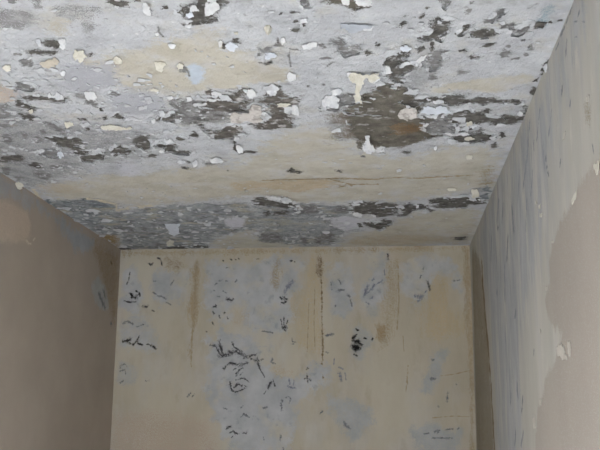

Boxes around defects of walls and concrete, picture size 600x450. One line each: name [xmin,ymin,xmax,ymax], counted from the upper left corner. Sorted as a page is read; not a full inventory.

peeling [0,0,563,249]
water stain [318,109,380,147]
water stain [92,233,494,450]